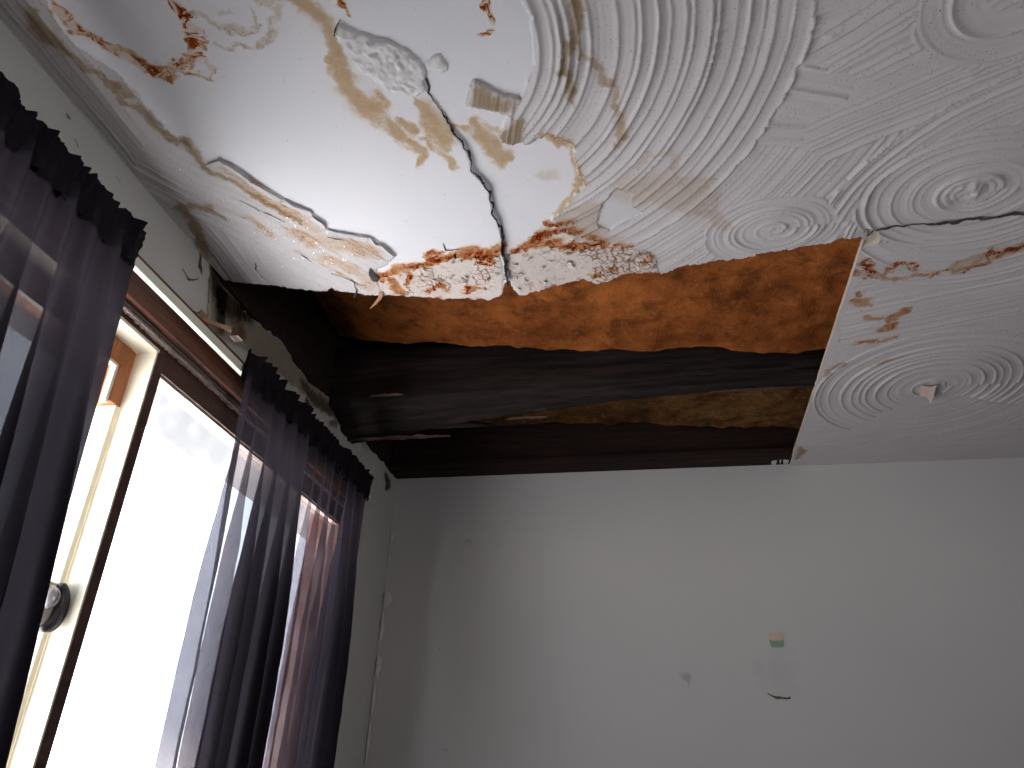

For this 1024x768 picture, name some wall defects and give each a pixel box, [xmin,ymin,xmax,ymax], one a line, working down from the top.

rust [52,1,118,56]
rust [131,0,206,84]
peeling [46,0,642,294]
crack [404,77,518,296]
crack [867,212,1024,236]
rust [375,220,633,294]
crack [550,246,659,282]
rust [853,258,948,279]
rust [963,243,1024,273]